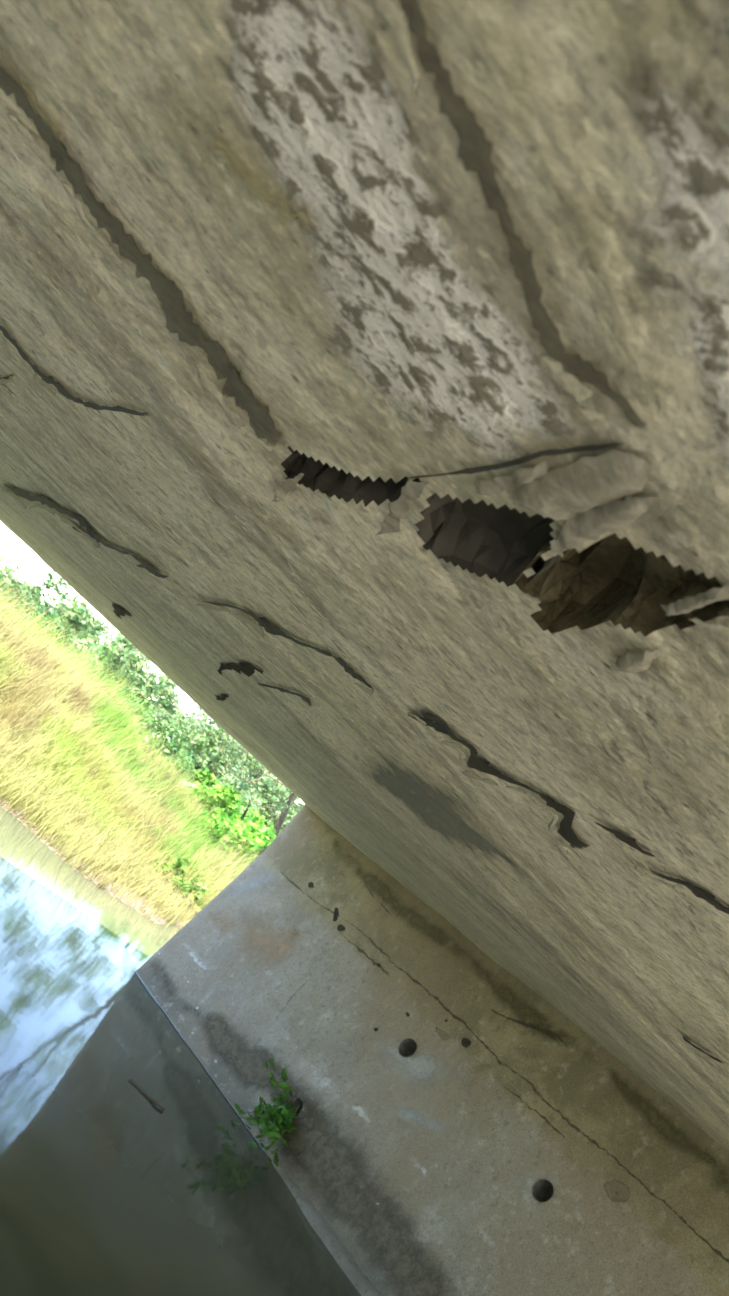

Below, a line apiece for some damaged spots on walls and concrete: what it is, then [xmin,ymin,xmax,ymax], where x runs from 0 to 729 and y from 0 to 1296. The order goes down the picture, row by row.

crack [0,66,282,453]
peeling [225,0,729,673]
crack [374,0,645,428]
crack [0,484,168,578]
spalling [112,603,131,619]
spalling [217,662,263,677]
crack [196,601,373,694]
crack [258,683,311,706]
crack [688,609,729,632]
crack [408,710,729,914]
leakage [185,1006,451,1296]
crack [282,873,729,1262]